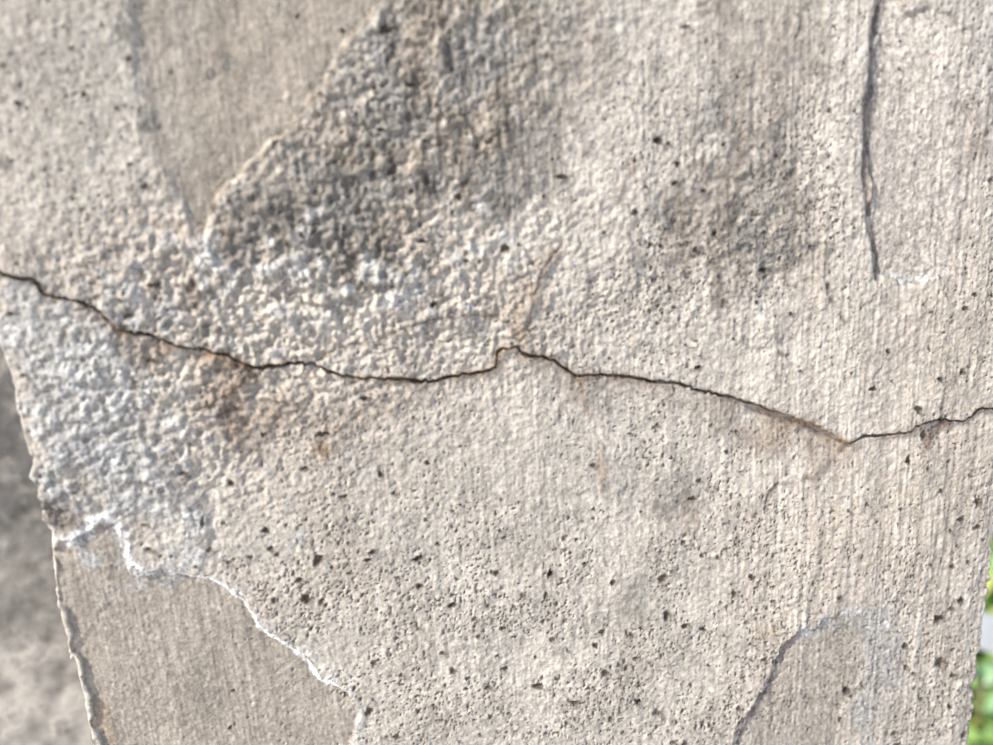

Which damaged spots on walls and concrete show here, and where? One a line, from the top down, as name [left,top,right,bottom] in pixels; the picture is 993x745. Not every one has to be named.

crack [0,240,608,419]
crack [636,377,882,480]
crack [916,407,993,448]
spalling [41,502,374,745]